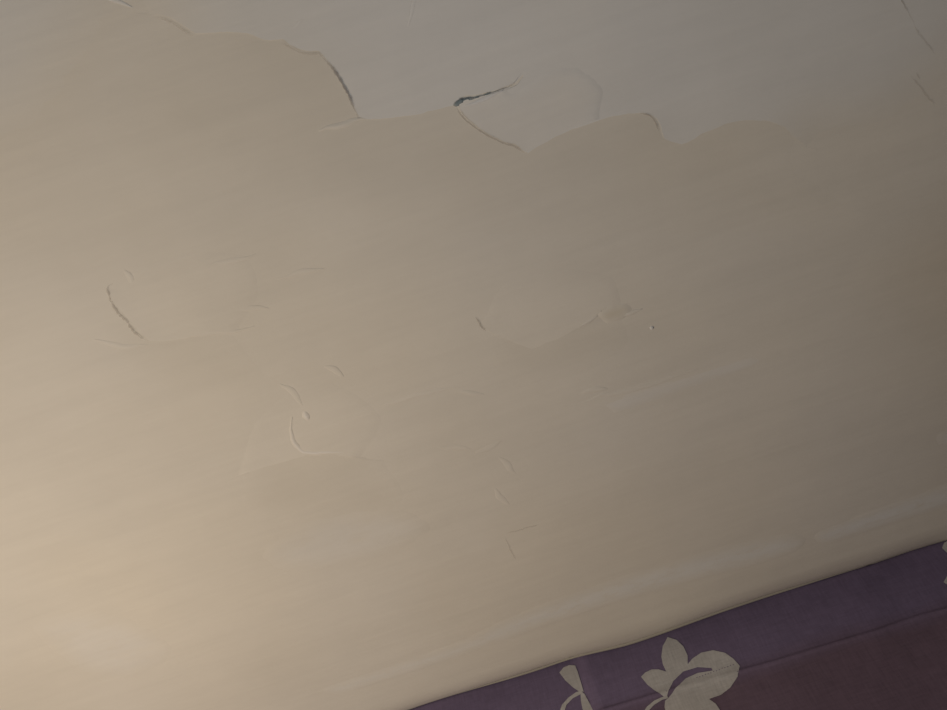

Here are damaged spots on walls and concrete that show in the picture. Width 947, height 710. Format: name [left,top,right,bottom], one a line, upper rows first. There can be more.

peeling [106,0,947,235]